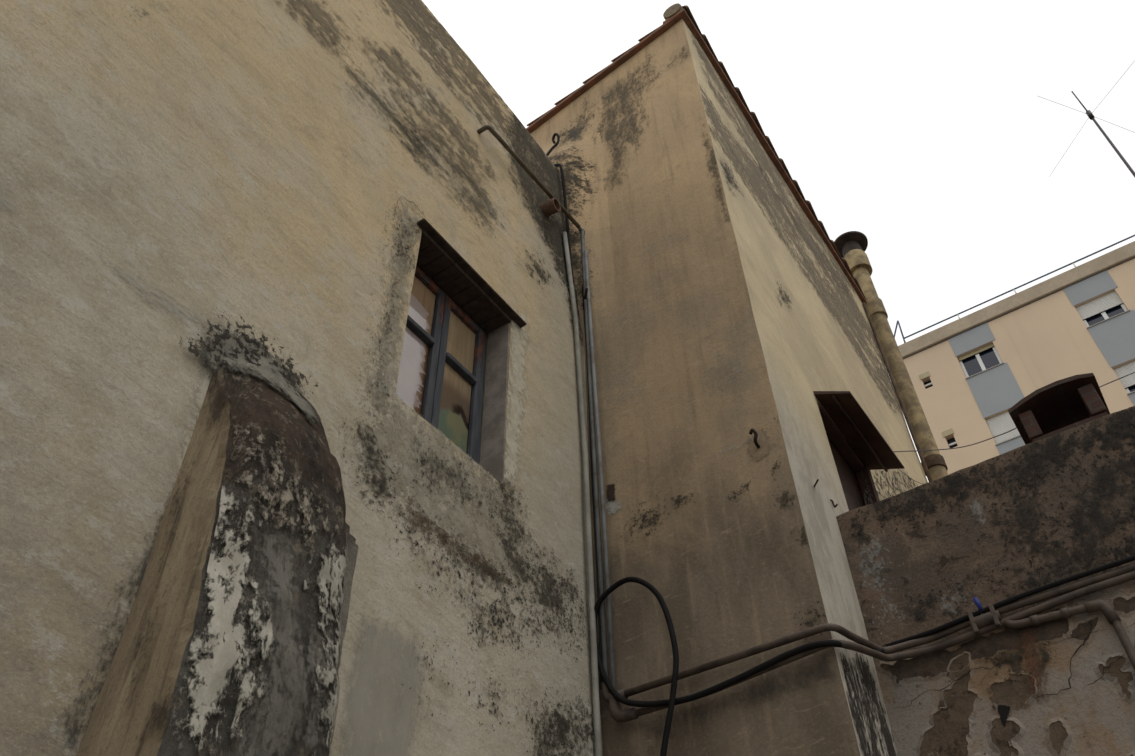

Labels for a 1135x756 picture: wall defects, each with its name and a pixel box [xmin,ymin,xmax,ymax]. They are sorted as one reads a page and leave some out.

damp [276,0,902,414]
peeling [164,424,348,756]
damp [383,493,595,756]
damp [838,407,1135,626]
flaking render [838,593,1135,756]
crack [1029,620,1135,700]